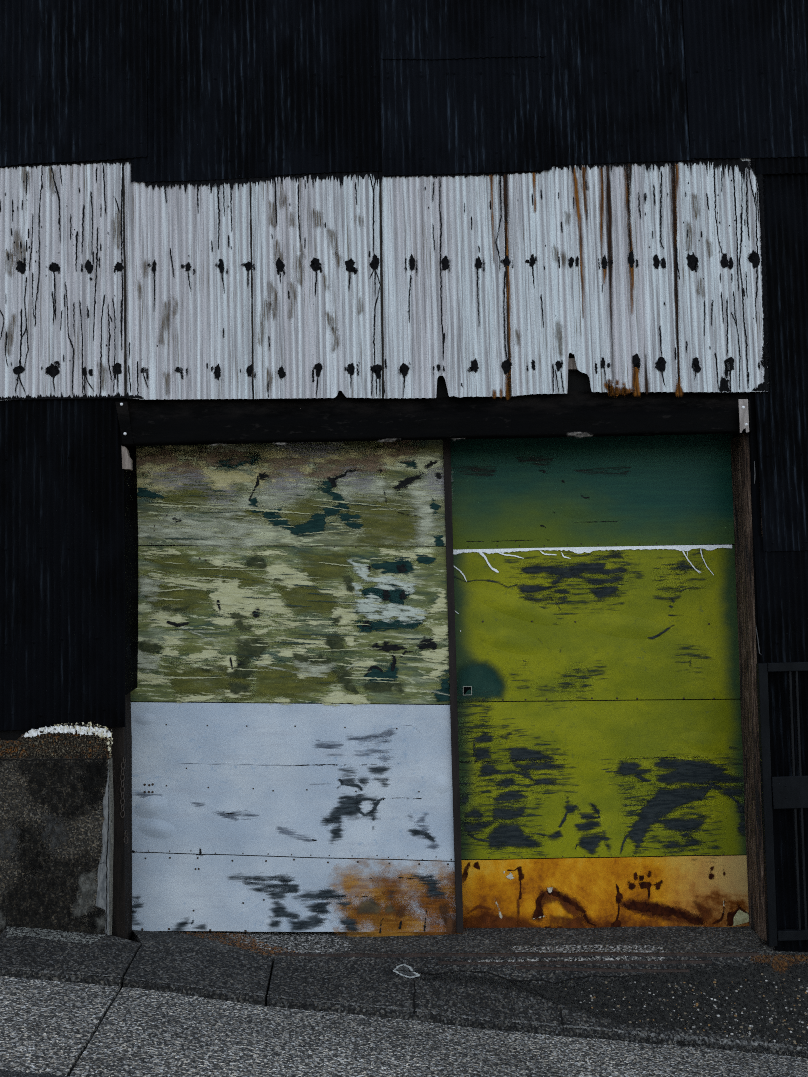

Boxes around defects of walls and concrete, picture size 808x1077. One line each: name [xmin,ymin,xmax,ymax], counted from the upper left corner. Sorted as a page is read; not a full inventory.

leakage [113,165,127,396]
leakage [159,301,178,343]
leakage [249,182,277,399]
leakage [313,210,340,266]
rust [489,174,511,399]
rust [600,164,649,396]
rust [670,165,683,396]
peeling [136,439,452,706]
peeling [316,730,394,841]
peeling [458,718,746,860]
peeling [229,876,402,933]
rust [334,862,597,937]